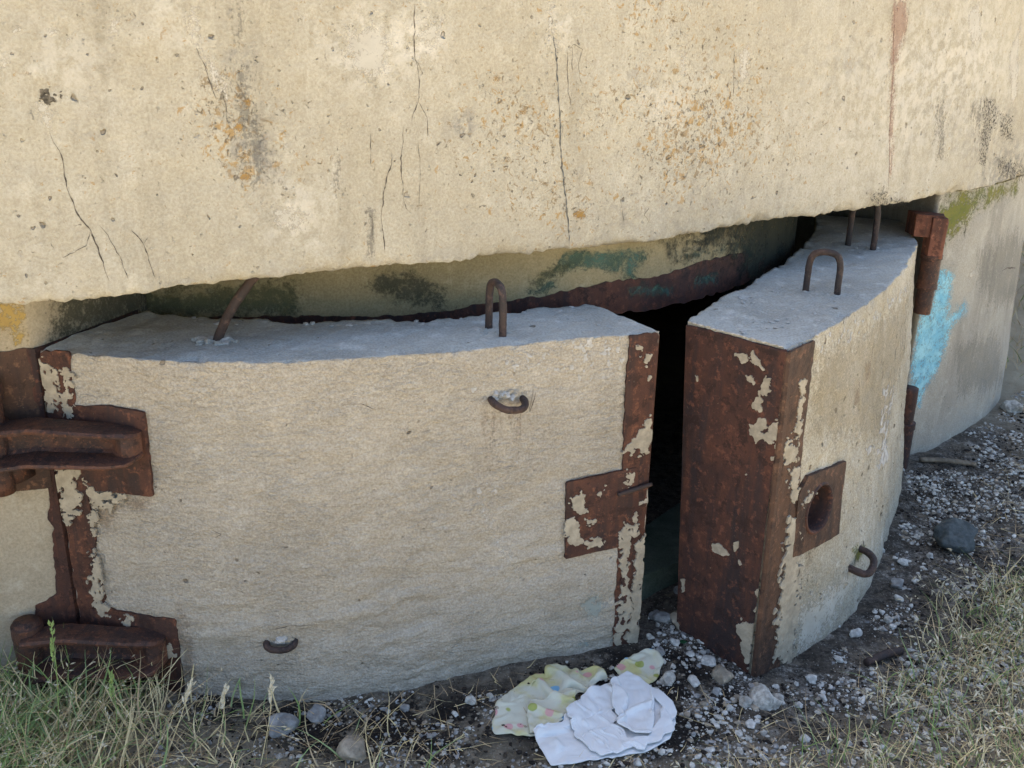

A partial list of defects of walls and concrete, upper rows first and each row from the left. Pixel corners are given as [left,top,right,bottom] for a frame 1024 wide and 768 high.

crack [50,134,155,277]
crack [369,10,428,250]
crack [551,29,583,241]
leakage [939,27,1024,245]
peeling [38,356,78,419]
peeling [54,470,134,627]
peeling [563,485,646,646]
rust [619,578,627,625]
peeling [619,414,653,458]
peeling [691,322,818,670]